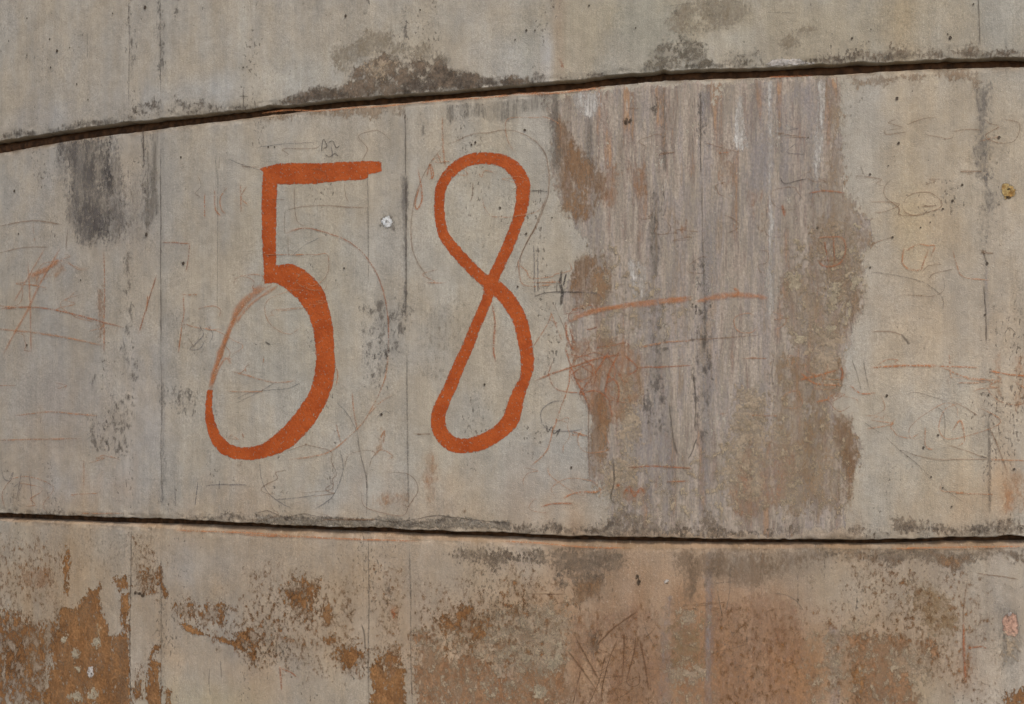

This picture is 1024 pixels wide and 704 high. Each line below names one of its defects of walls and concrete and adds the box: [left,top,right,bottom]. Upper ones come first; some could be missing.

water stain [269,26,529,123]
water stain [58,135,125,245]
water stain [509,506,726,538]
rust [278,573,335,631]
rust [821,629,948,704]
rust [1001,686,1024,704]